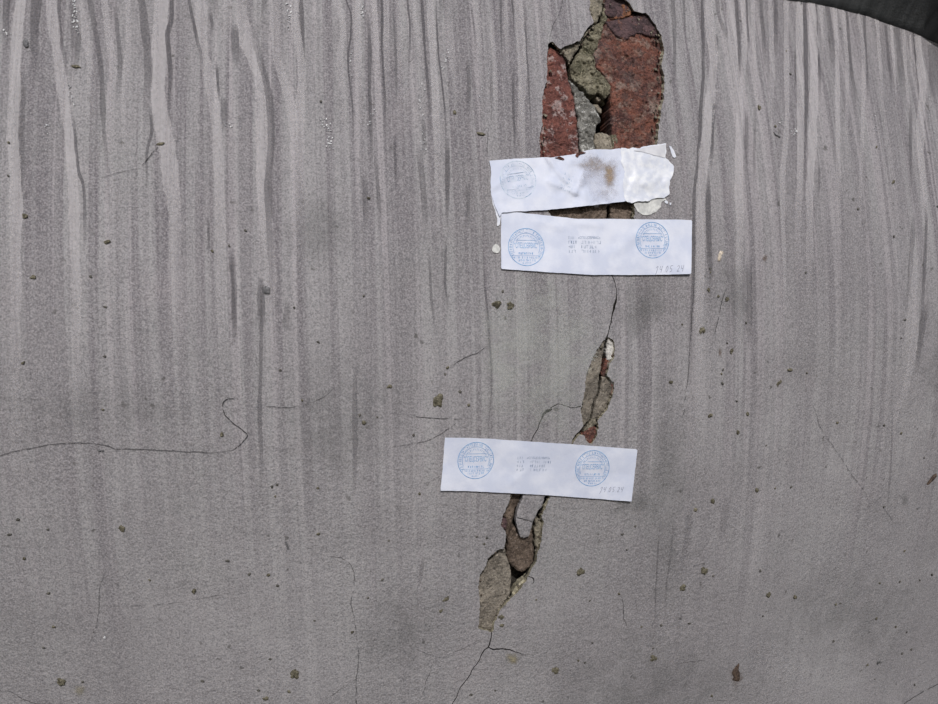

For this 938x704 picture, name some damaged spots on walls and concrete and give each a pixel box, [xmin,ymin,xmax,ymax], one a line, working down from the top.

water stain [165,0,174,74]
water stain [367,0,385,126]
spalling [539,0,665,158]
water stain [699,1,715,144]
water stain [795,2,820,119]
spalling [548,201,635,219]
crack [606,275,617,337]
crack [0,398,248,456]
crack [531,404,581,442]
spalling [572,337,615,444]
spalling [478,493,550,632]
crack [452,632,521,704]